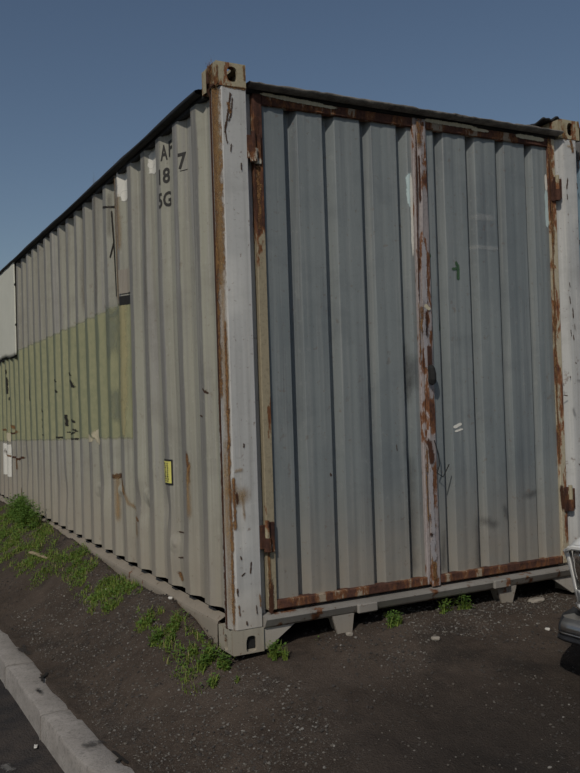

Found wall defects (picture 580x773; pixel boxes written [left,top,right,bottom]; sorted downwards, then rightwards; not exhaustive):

rust [206,63,246,629]
rust [415,121,431,368]
rust [547,135,560,459]
rust [267,552,275,615]
rust [426,438,436,537]